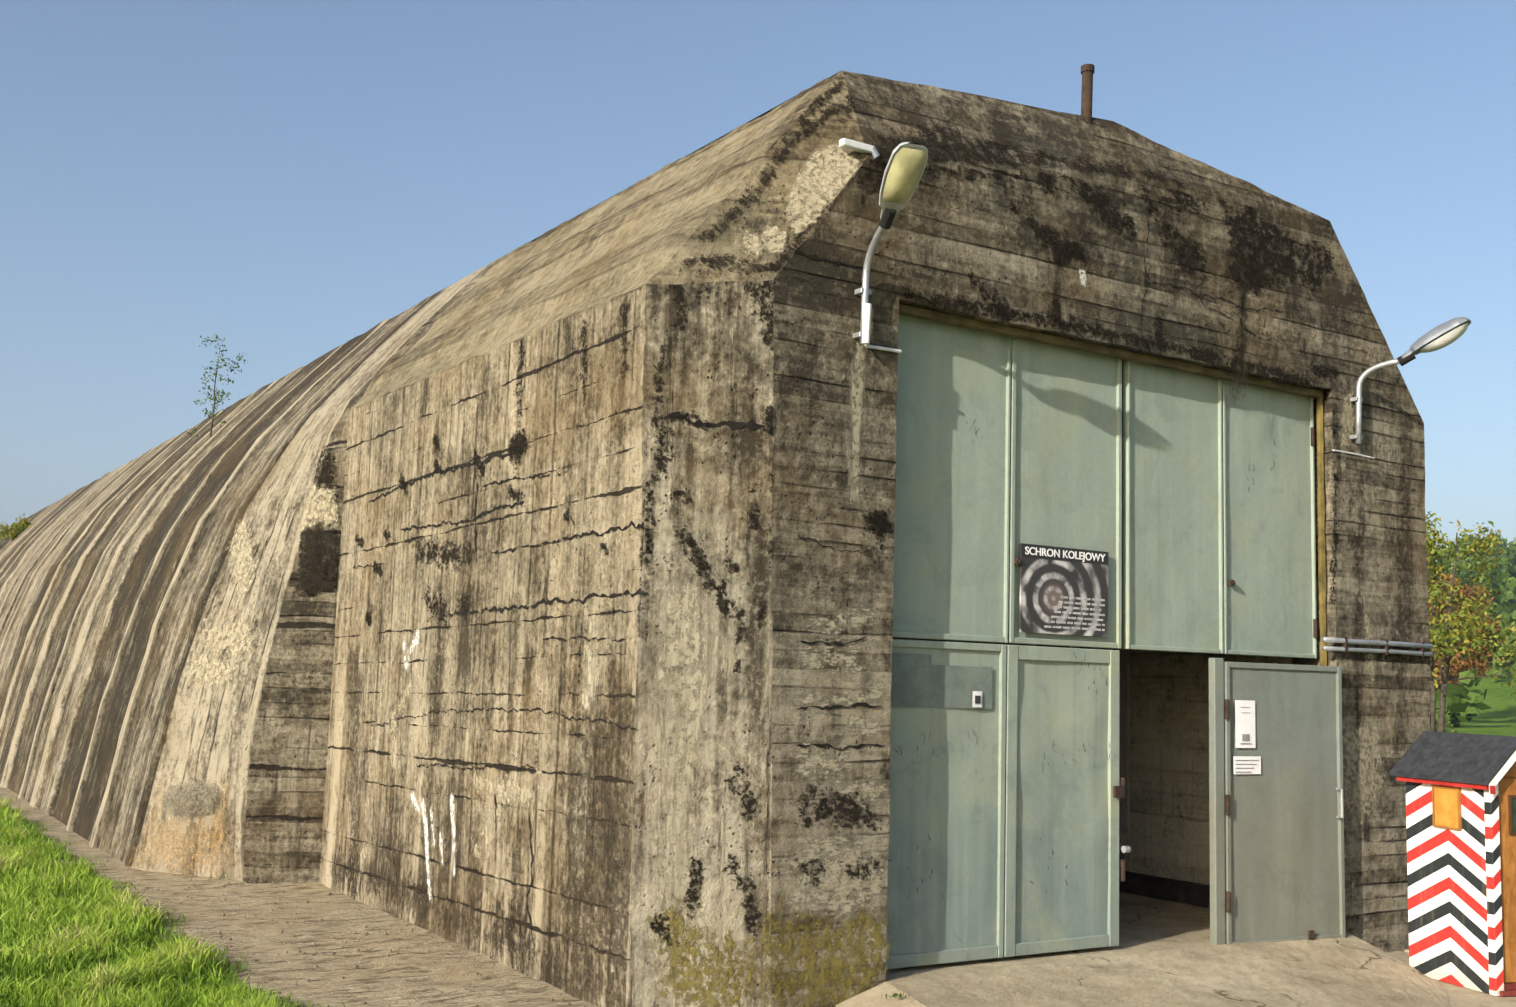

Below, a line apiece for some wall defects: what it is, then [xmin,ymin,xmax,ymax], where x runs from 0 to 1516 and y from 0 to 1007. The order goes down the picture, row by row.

crack [664,406,773,432]
spalling [294,445,364,597]
damp [789,607,888,810]
damp [781,831,884,920]